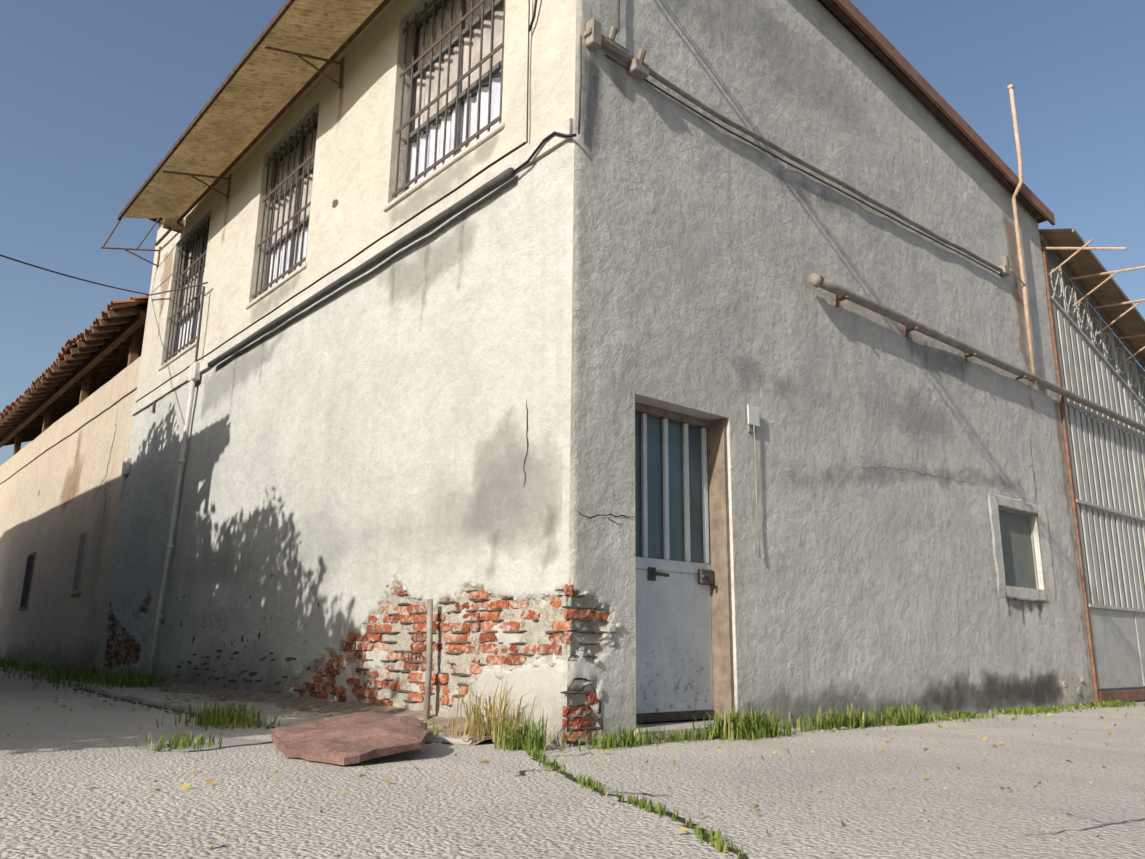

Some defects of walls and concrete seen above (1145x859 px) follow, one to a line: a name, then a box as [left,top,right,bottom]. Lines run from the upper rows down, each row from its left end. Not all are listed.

crack [521,400,529,487]
crack [576,510,636,525]
spalling [101,574,624,746]
damp [918,675,1060,711]